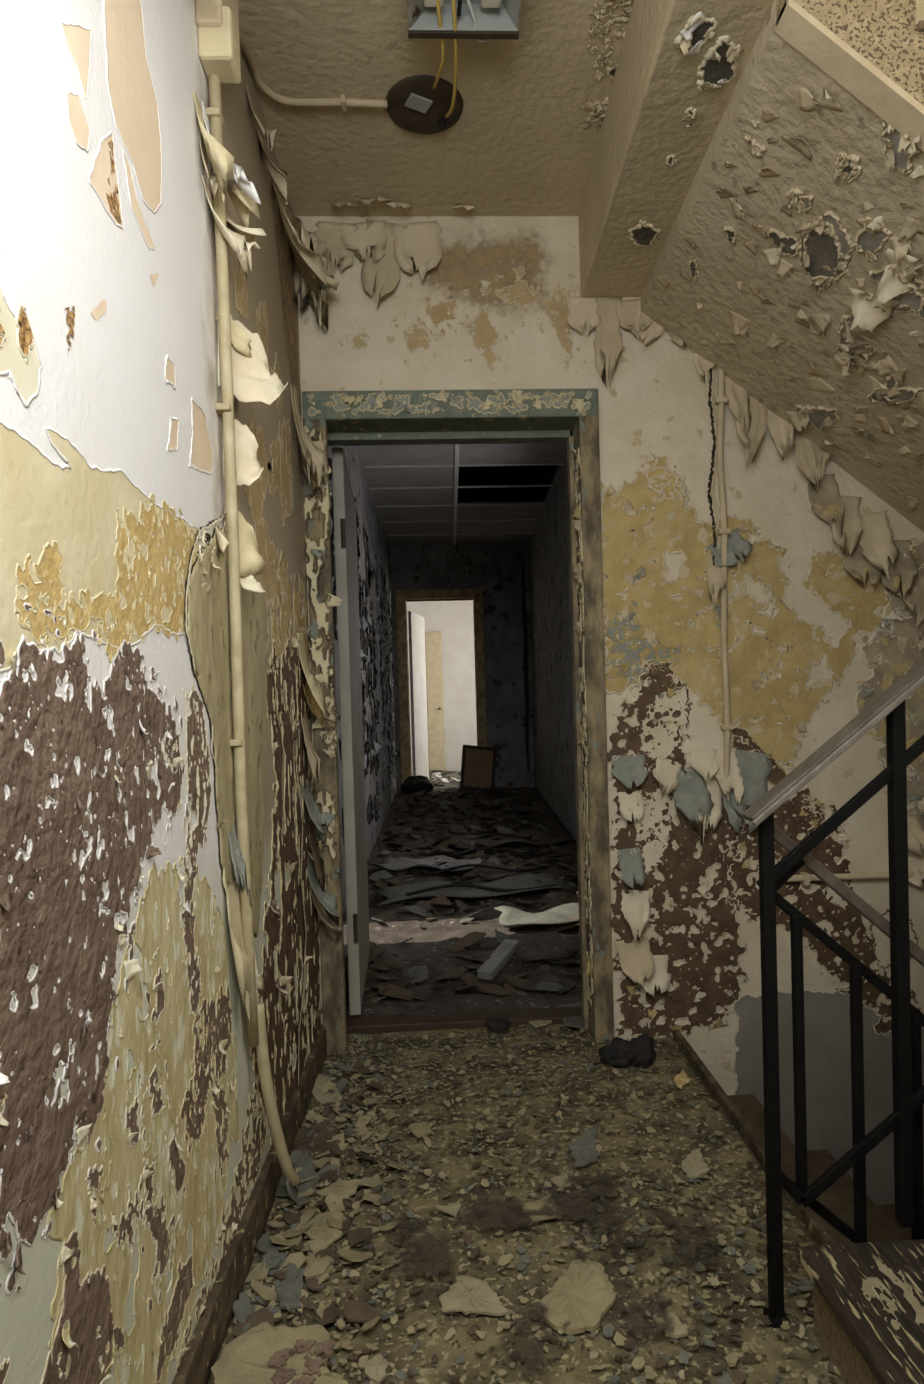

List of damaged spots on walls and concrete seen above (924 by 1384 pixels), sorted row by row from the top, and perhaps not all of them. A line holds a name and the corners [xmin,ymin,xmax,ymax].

peeling [673,11,744,91]
peeling [798,86,843,112]
crack [707,368,721,569]
peeling [600,108,924,1107]
peeling [0,82,752,1384]
peeling [859,1259,924,1352]